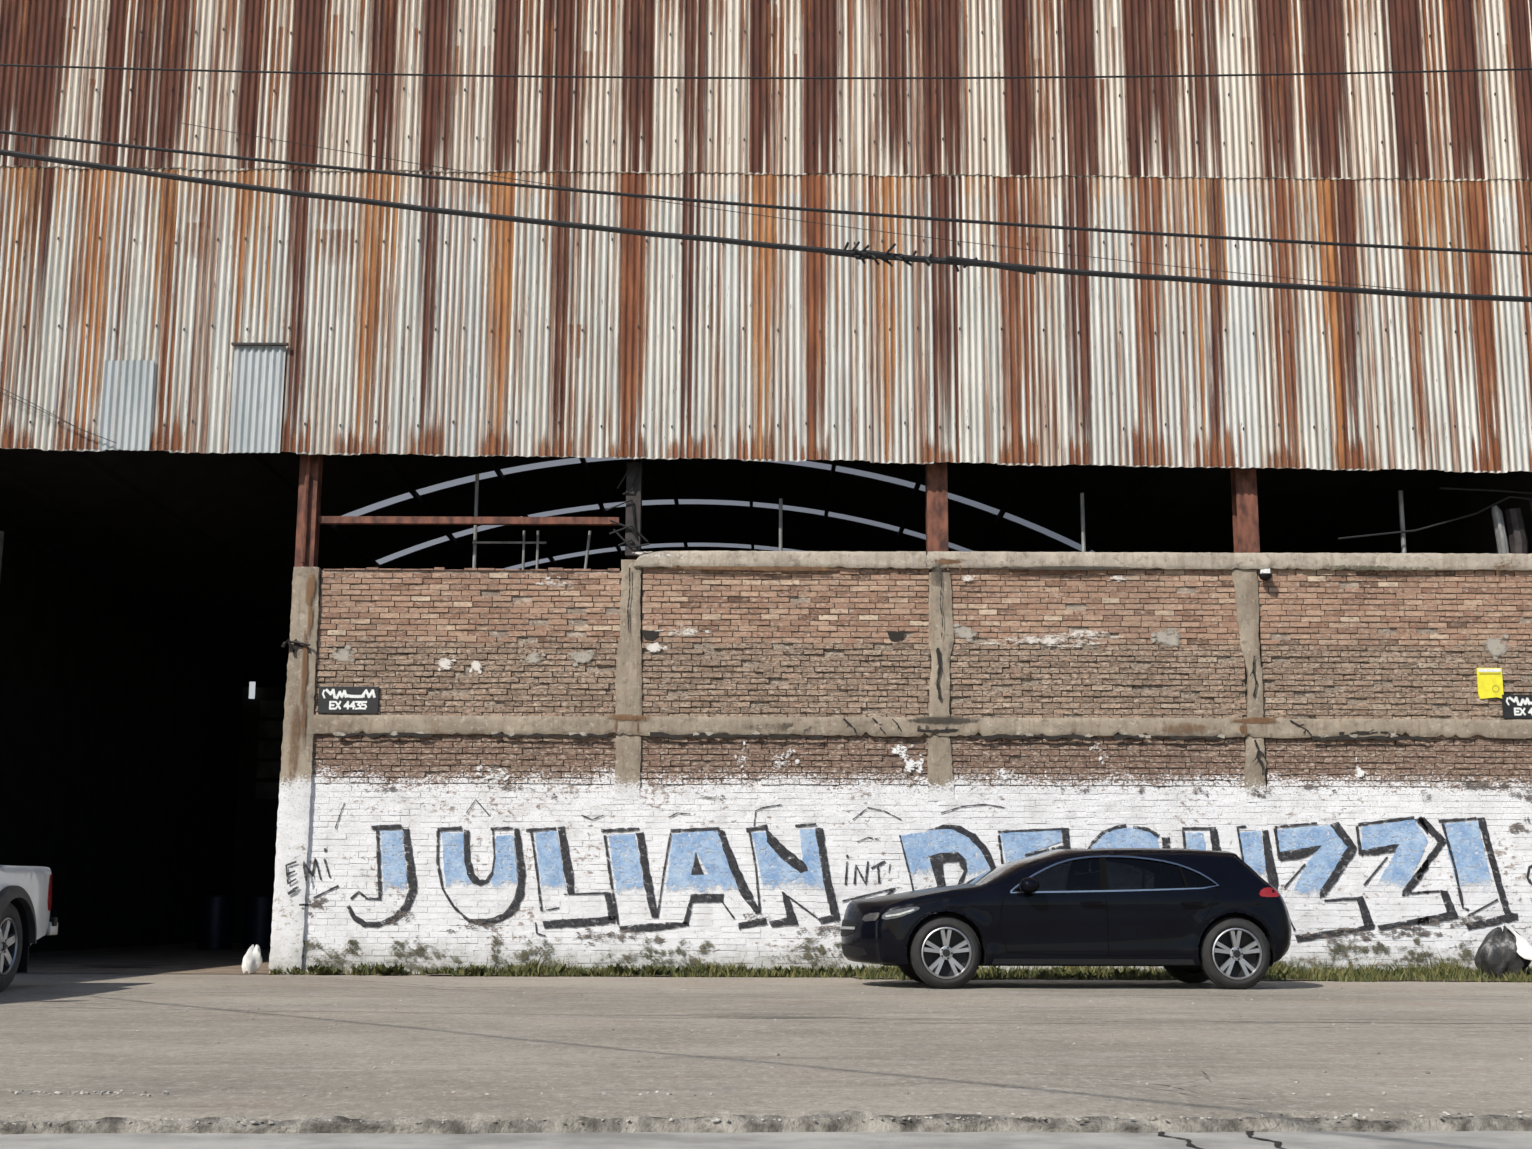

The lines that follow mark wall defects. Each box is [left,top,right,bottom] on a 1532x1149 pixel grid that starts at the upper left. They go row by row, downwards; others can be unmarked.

corrosion [225,0,459,454]
corrosion [478,0,722,458]
corrosion [732,0,852,460]
corrosion [864,0,1105,465]
corrosion [1112,0,1243,467]
corrosion [1242,0,1501,471]
spalling [648,731,823,768]
spalling [970,731,1225,763]
spalling [1312,733,1431,779]
peeling [1462,776,1532,834]